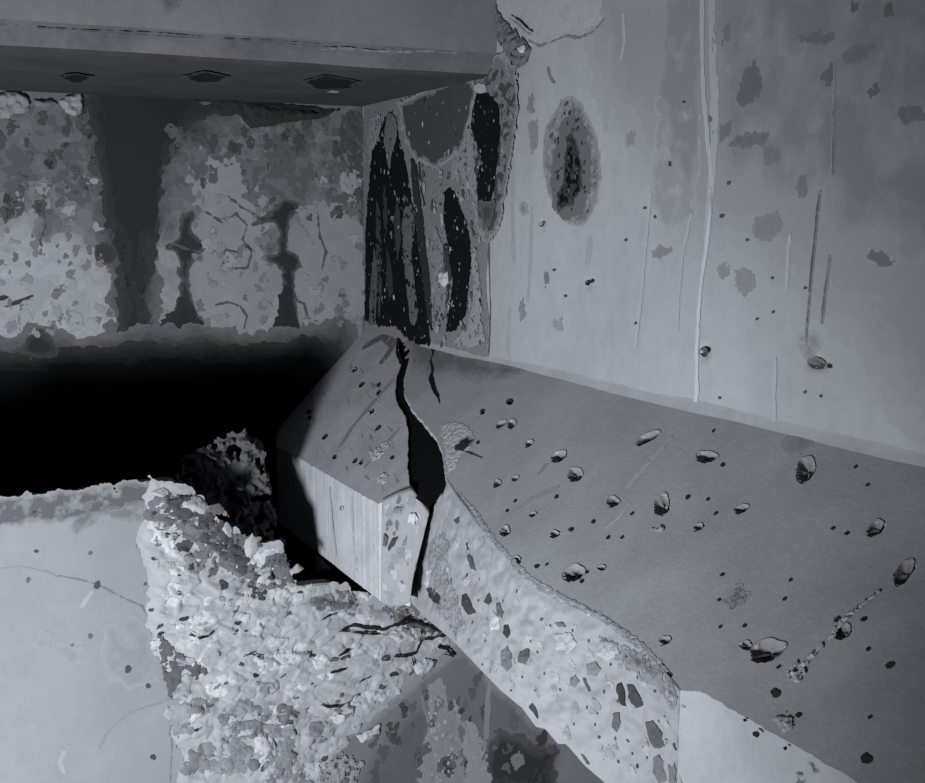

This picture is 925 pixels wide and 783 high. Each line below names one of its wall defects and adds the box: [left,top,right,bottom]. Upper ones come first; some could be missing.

crack [166,195,262,270]
crack [317,215,328,270]
crack [215,301,248,329]
crack [293,299,318,322]
water stain [0,0,925,587]
crack [395,338,446,507]
crack [320,613,454,708]
spalling [136,421,685,783]
hole [833,617,851,640]